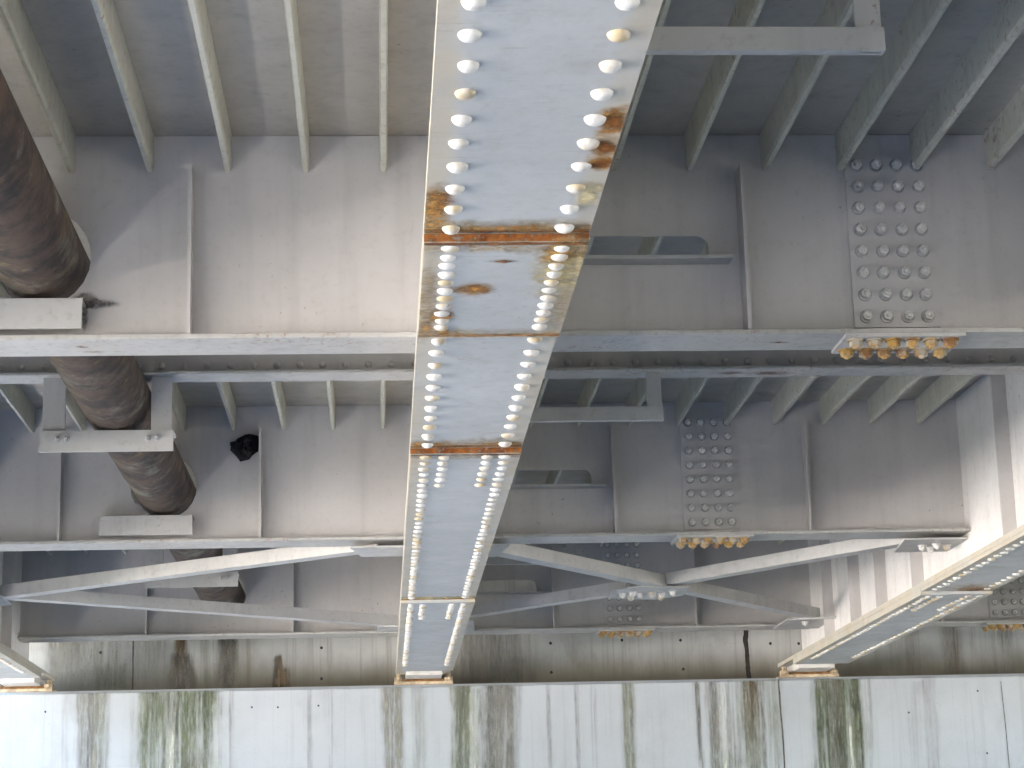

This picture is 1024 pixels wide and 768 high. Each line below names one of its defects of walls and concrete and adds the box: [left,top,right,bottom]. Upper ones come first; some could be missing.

rust [587,108,626,169]
rust [424,192,589,315]
rust [419,270,559,337]
rust [410,440,522,458]
leakage [219,639,236,687]
crack [743,630,751,679]
leakage [140,692,213,768]
leakage [815,679,863,768]